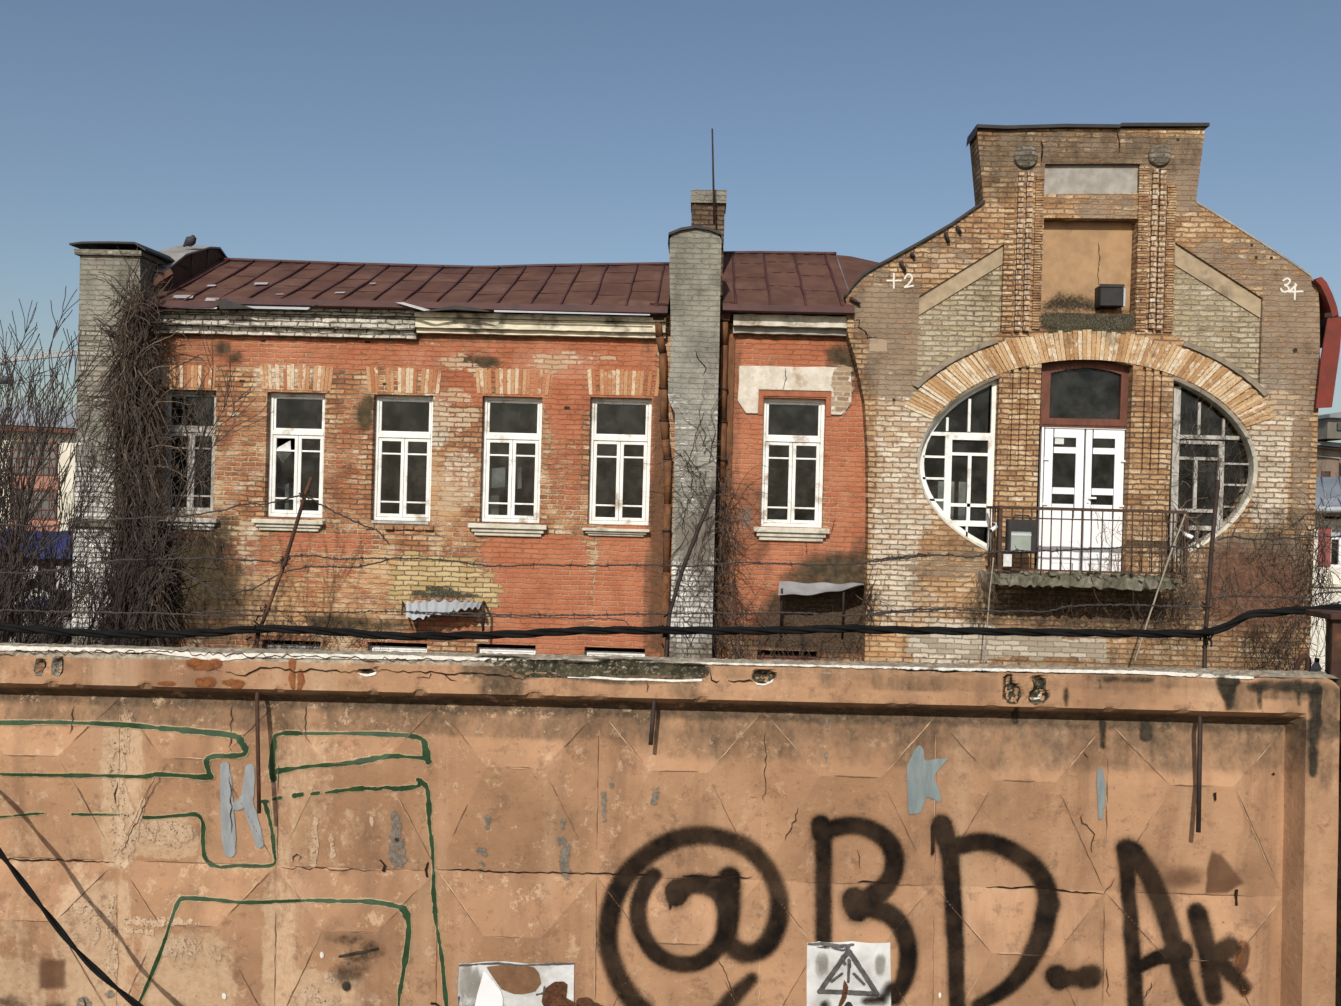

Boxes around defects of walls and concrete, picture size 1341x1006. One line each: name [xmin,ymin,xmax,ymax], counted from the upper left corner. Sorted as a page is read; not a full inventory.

crack [0,649,529,750]
spalling [753,670,776,685]
peeling [906,634,1108,662]
spalling [1003,674,1049,704]
water stain [1218,676,1322,776]
crack [760,732,768,801]